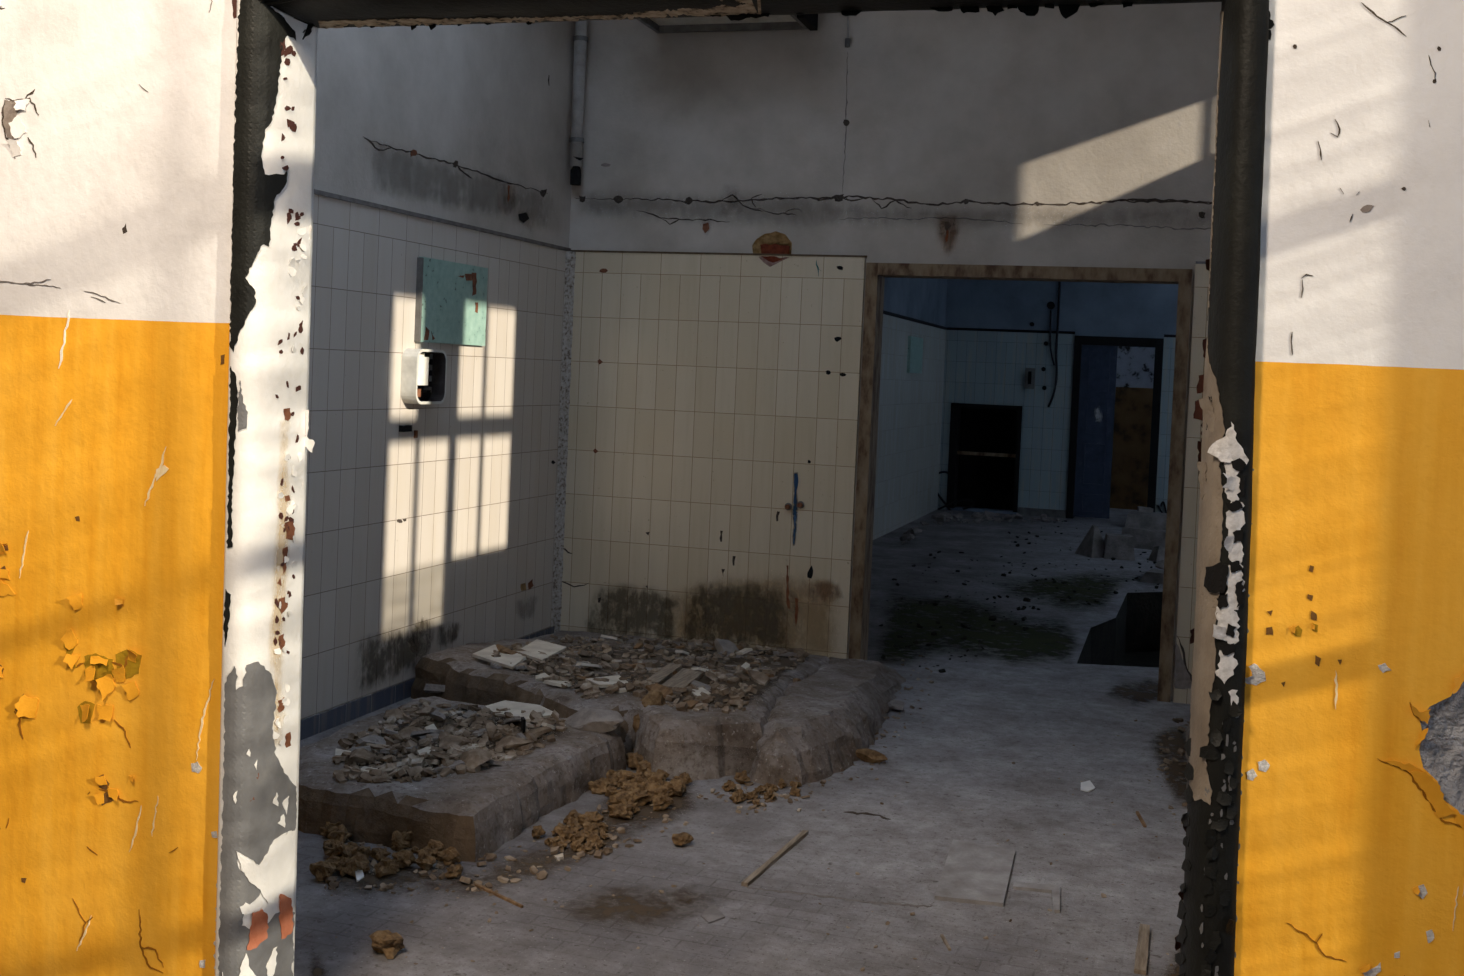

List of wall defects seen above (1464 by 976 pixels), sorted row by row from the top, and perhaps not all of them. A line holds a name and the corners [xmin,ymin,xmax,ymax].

crack [1361,2,1436,81]
peeling [1,89,39,158]
crack [364,52,1212,230]
peeling [220,0,770,548]
flaking render [752,231,792,267]
peeling [1077,11,1285,976]
mould [588,586,786,646]
peeling [14,694,39,739]
peeling [61,629,142,748]
peeling [199,381,315,976]
flaking render [1378,672,1464,830]
crack [1288,923,1347,962]